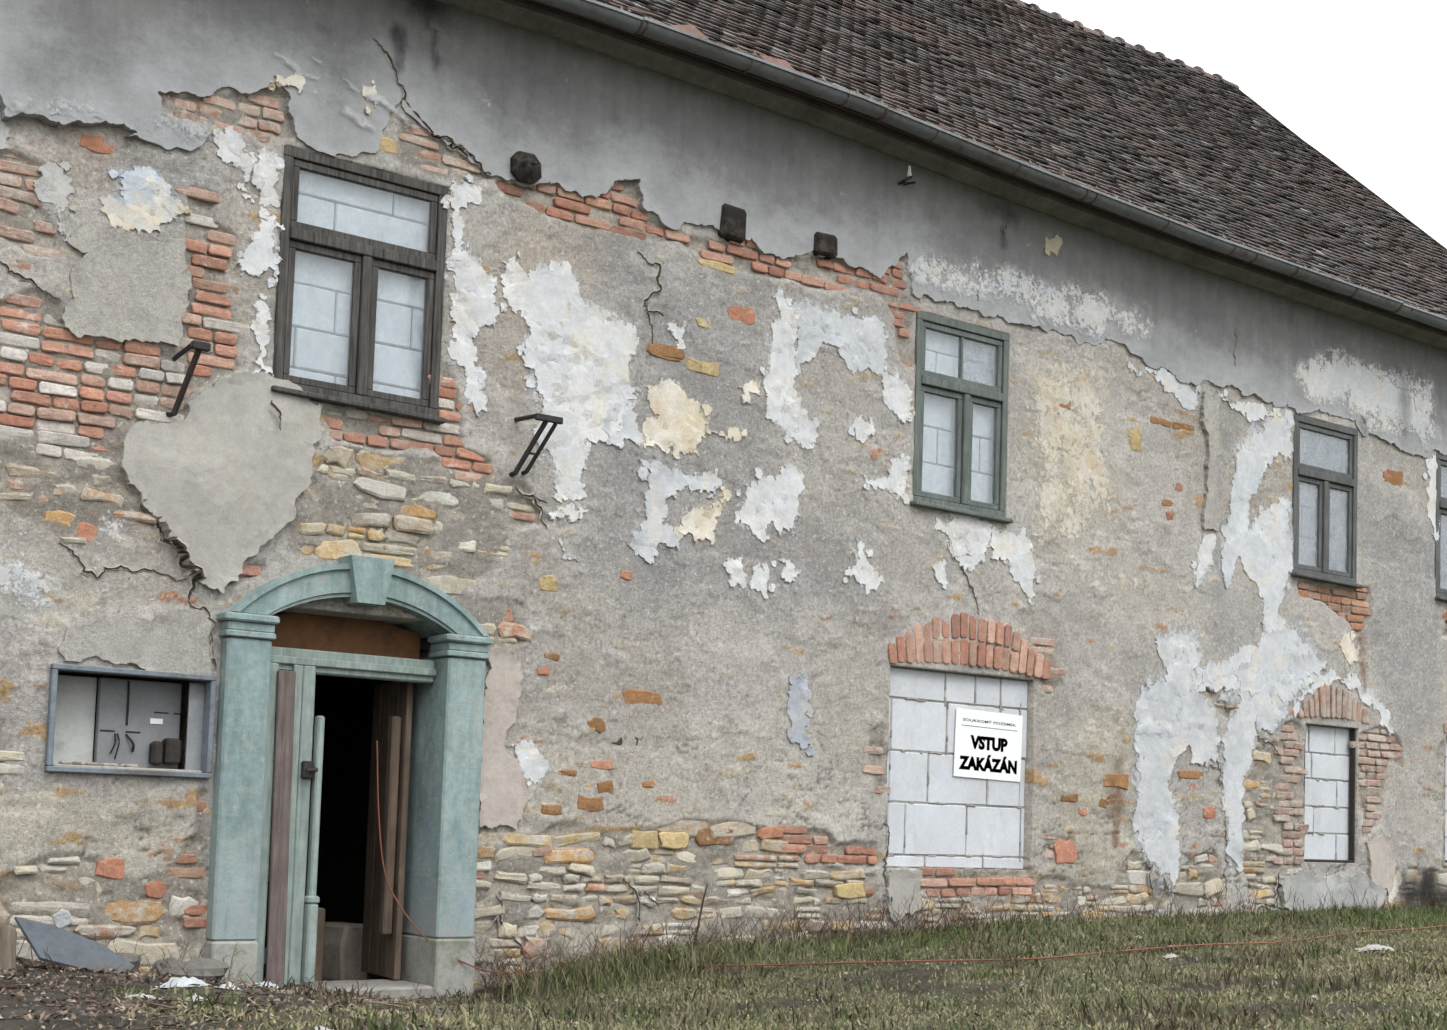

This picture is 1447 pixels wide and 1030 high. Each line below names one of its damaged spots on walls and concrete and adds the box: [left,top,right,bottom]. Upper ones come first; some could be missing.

crack [373,38,491,175]
flaking render [0,71,305,544]
peeling [298,124,920,599]
crack [637,252,664,357]
peeling [1422,453,1440,541]
crack [59,499,217,670]
flaking render [480,609,532,643]
peeling [918,361,1402,929]
flaking render [0,750,25,794]
flaking render [0,854,207,972]
flaking render [474,820,887,990]
flaking render [1387,862,1447,909]